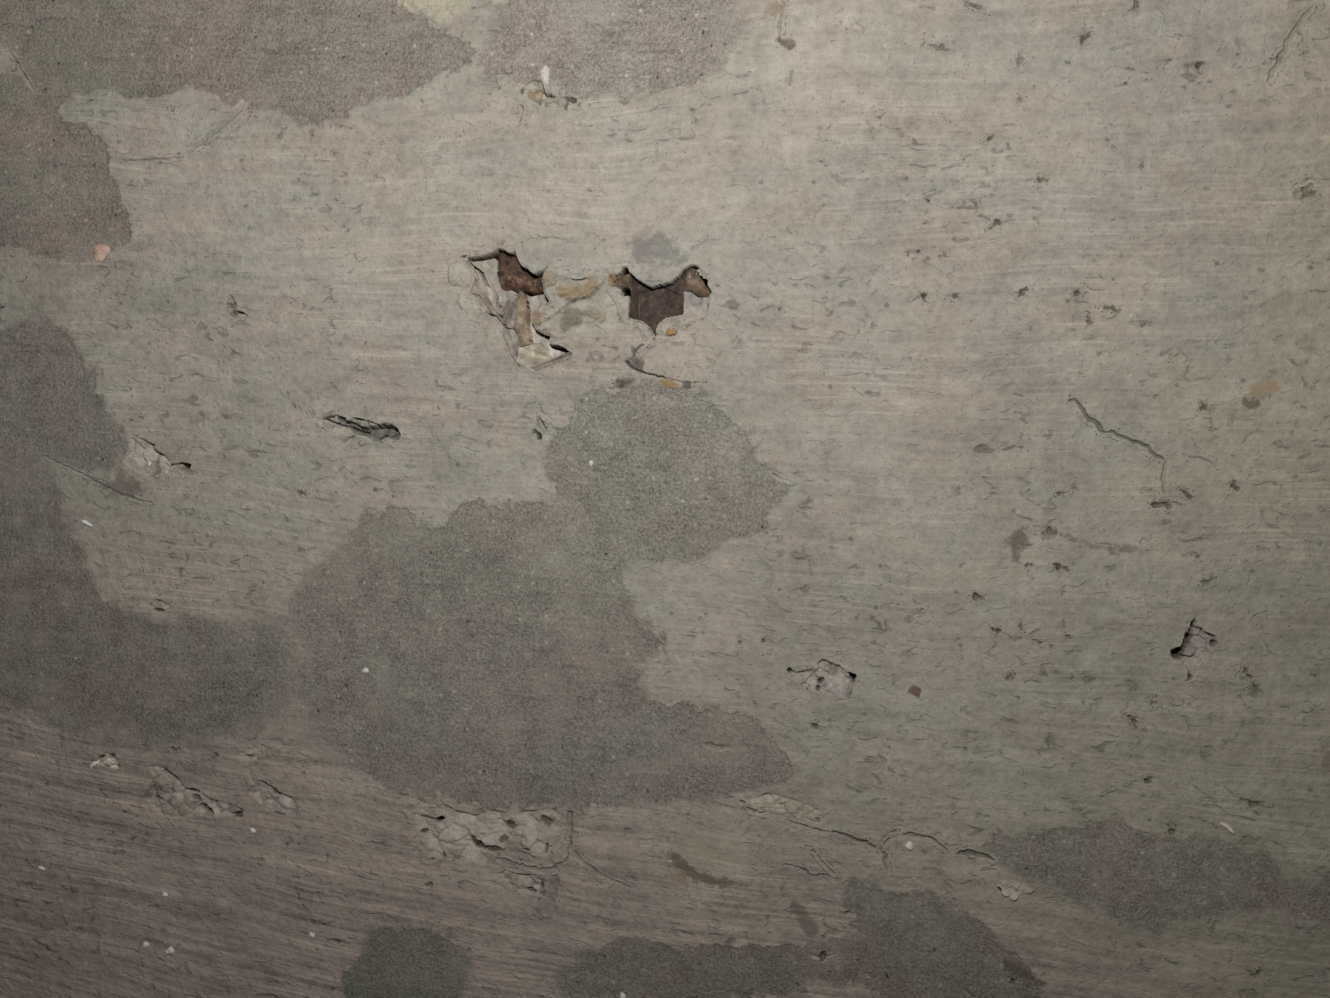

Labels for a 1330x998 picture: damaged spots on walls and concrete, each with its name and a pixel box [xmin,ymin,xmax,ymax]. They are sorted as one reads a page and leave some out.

corrosion [498,252,556,332]
spalling [465,245,714,373]
corrosion [608,272,632,294]
corrosion [685,268,711,298]
crack [1066,394,1217,498]
peeling [0,305,796,820]
peeling [978,813,1330,942]